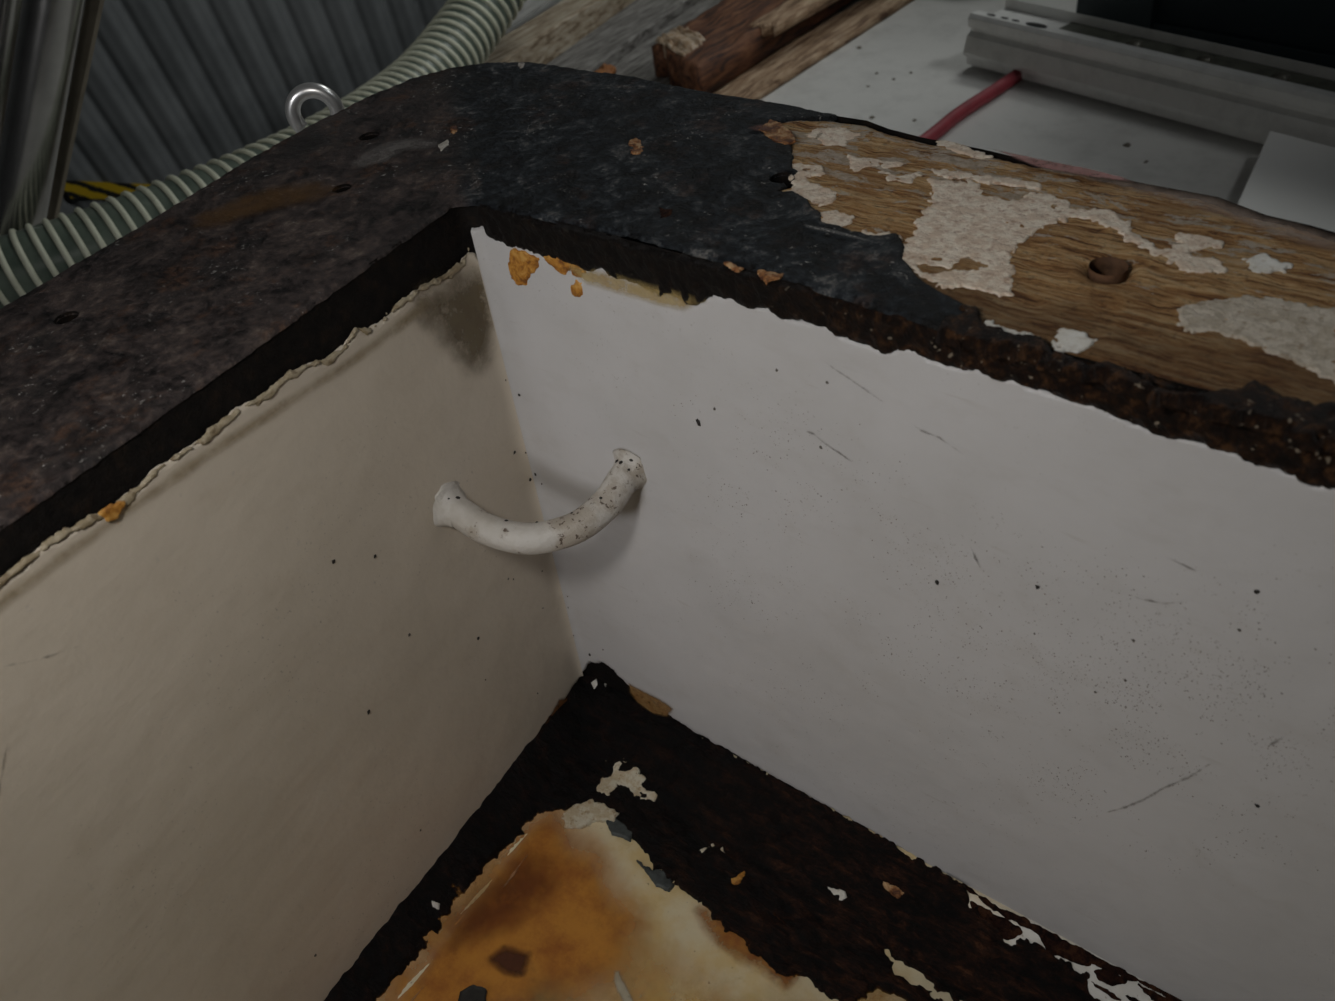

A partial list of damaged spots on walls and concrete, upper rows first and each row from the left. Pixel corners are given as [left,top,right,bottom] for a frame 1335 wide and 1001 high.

corrosion [751,119,796,145]
corrosion [628,138,643,155]
peeling [787,127,1228,298]
corrosion [508,248,586,297]
corrosion [724,261,784,285]
peeling [1242,253,1293,274]
peeling [984,320,1033,335]
peeling [1051,328,1098,353]
peeling [1176,295,1335,384]
corrosion [98,501,125,524]
corrosion [324,675,1100,1001]
peeling [961,883,1182,1001]